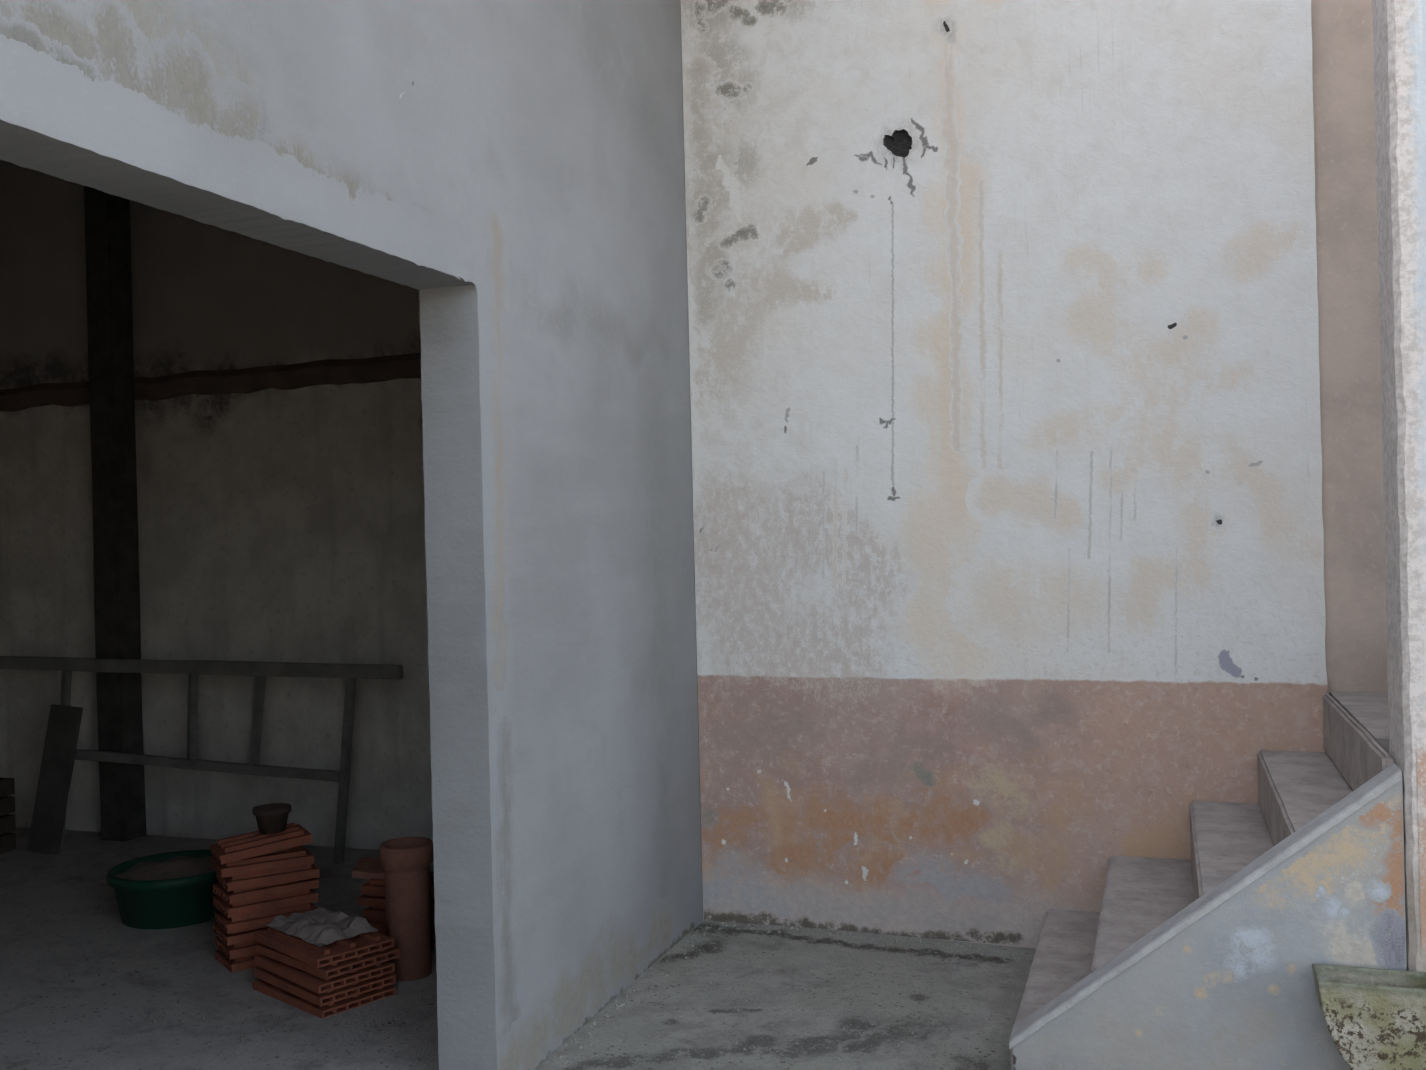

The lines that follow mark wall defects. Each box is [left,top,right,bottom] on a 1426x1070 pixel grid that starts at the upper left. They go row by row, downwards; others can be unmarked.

water stain [681,0,840,193]
spalling [854,113,939,197]
peeling [683,53,893,511]